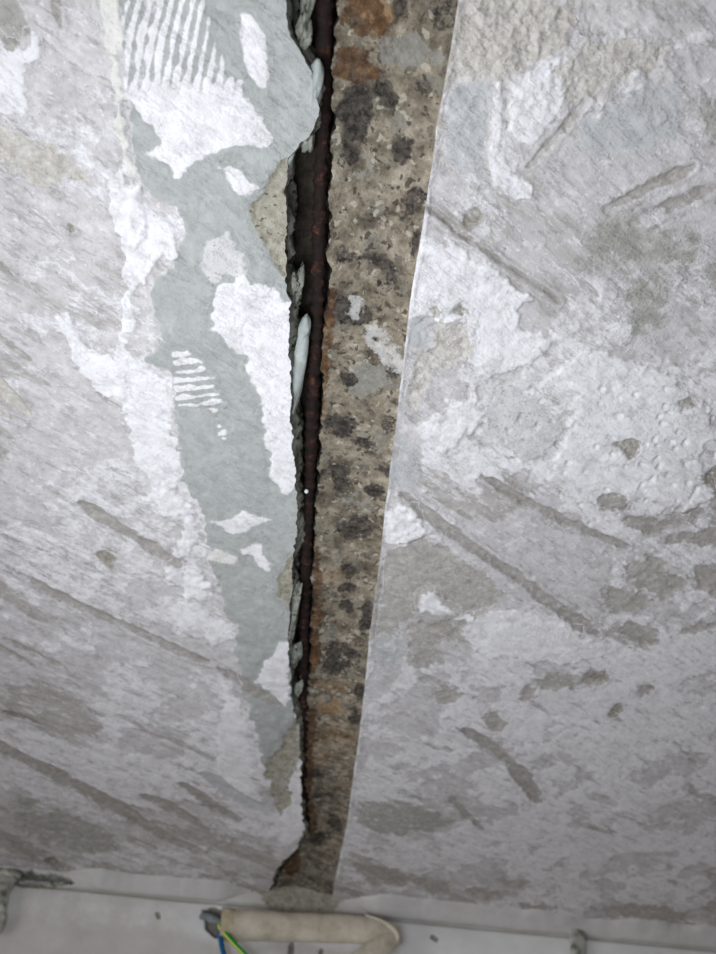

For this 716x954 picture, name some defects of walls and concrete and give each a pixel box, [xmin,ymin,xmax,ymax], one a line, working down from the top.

spalling [0,0,339,890]
corrosion [279,0,403,879]